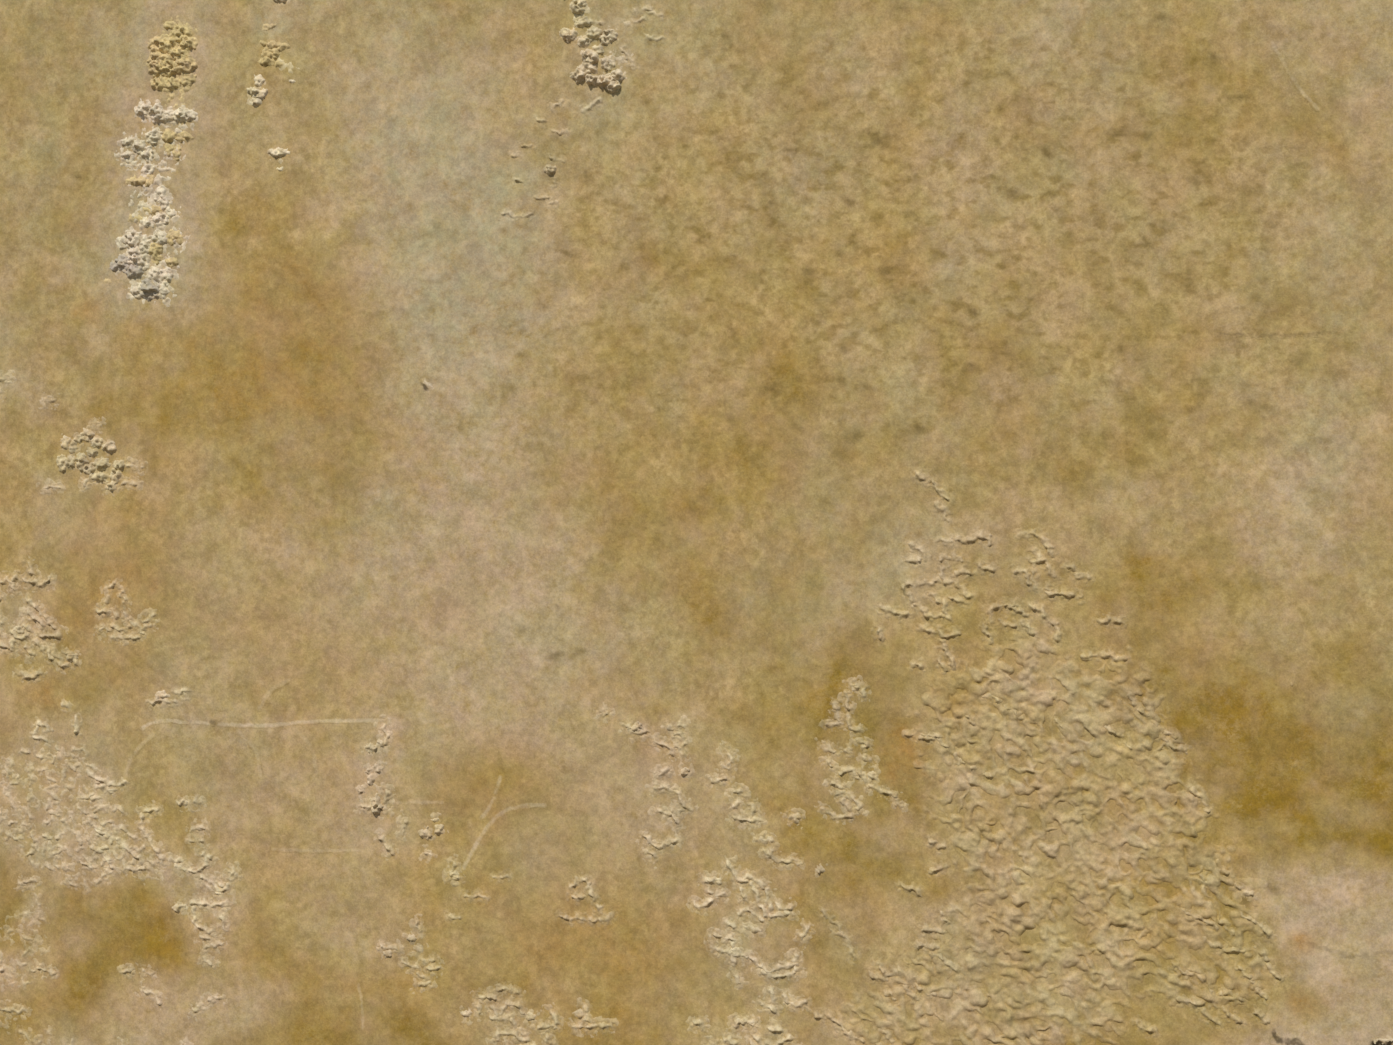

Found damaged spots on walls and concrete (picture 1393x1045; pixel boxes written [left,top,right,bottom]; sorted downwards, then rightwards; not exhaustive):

flaking render [1367,1035,1393,1045]